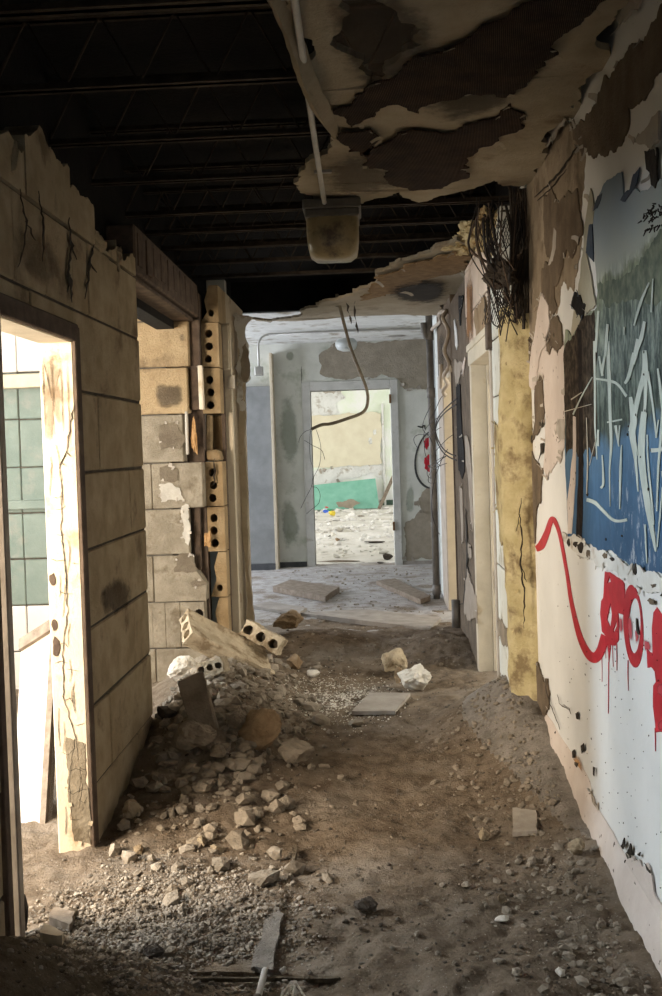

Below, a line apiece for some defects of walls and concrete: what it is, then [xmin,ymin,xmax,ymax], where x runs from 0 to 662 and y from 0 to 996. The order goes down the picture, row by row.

crack [18,189,97,302]
flaking render [526,3,662,544]
flaking render [311,339,427,416]
peeling [313,465,383,485]
flaking render [402,357,478,624]
crack [49,407,87,832]
flaking render [535,661,550,717]